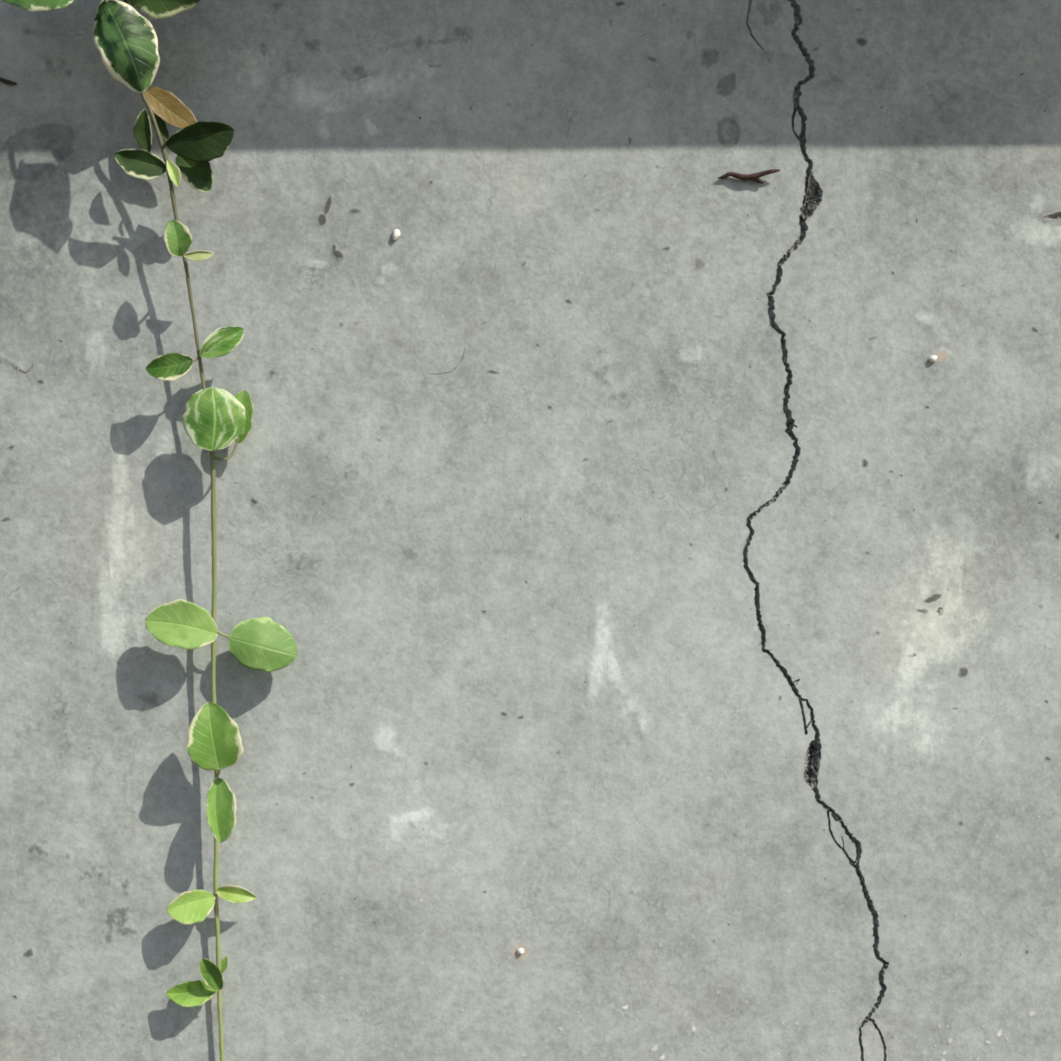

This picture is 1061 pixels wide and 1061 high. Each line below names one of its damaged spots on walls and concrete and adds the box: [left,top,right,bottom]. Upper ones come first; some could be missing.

crack [743,0,889,1061]